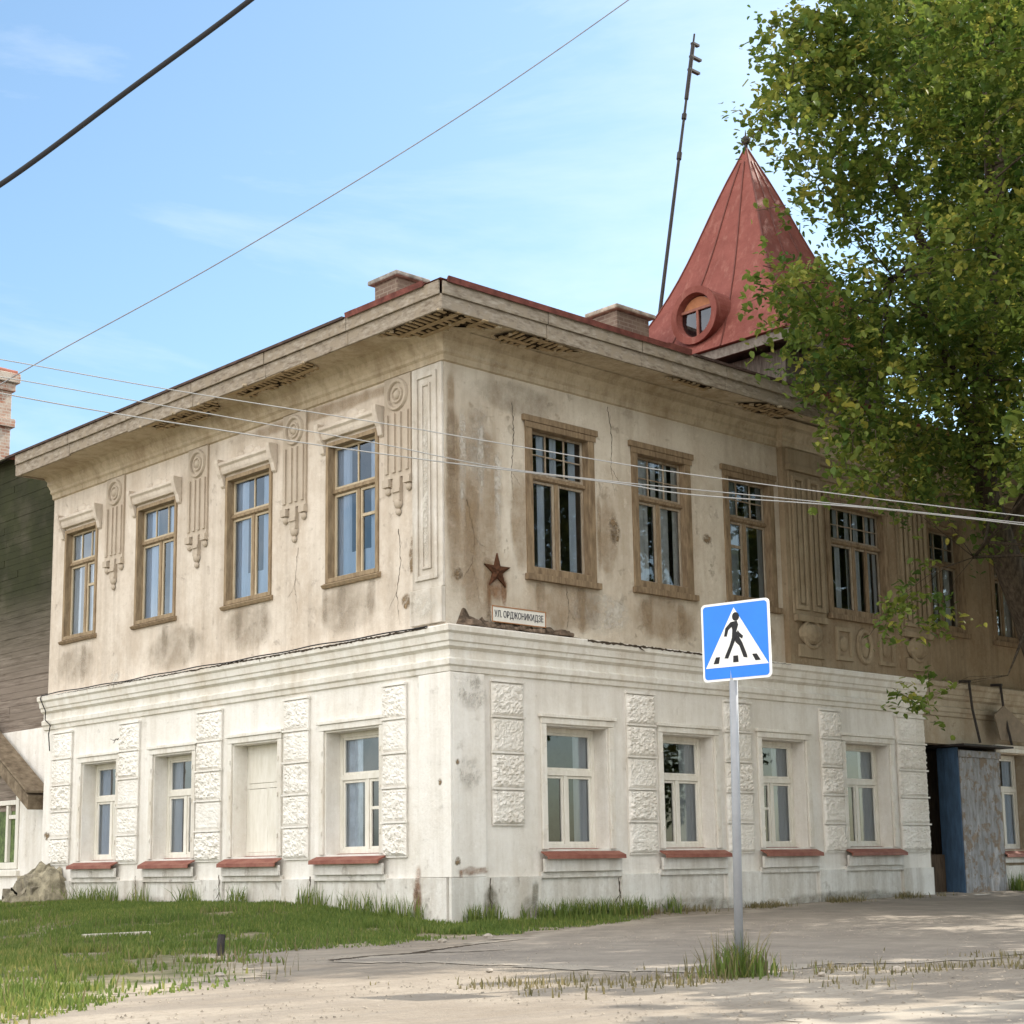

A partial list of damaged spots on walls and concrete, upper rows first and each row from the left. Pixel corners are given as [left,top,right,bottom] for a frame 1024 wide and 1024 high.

crack [56,529,427,695]
peeling [465,619,574,637]